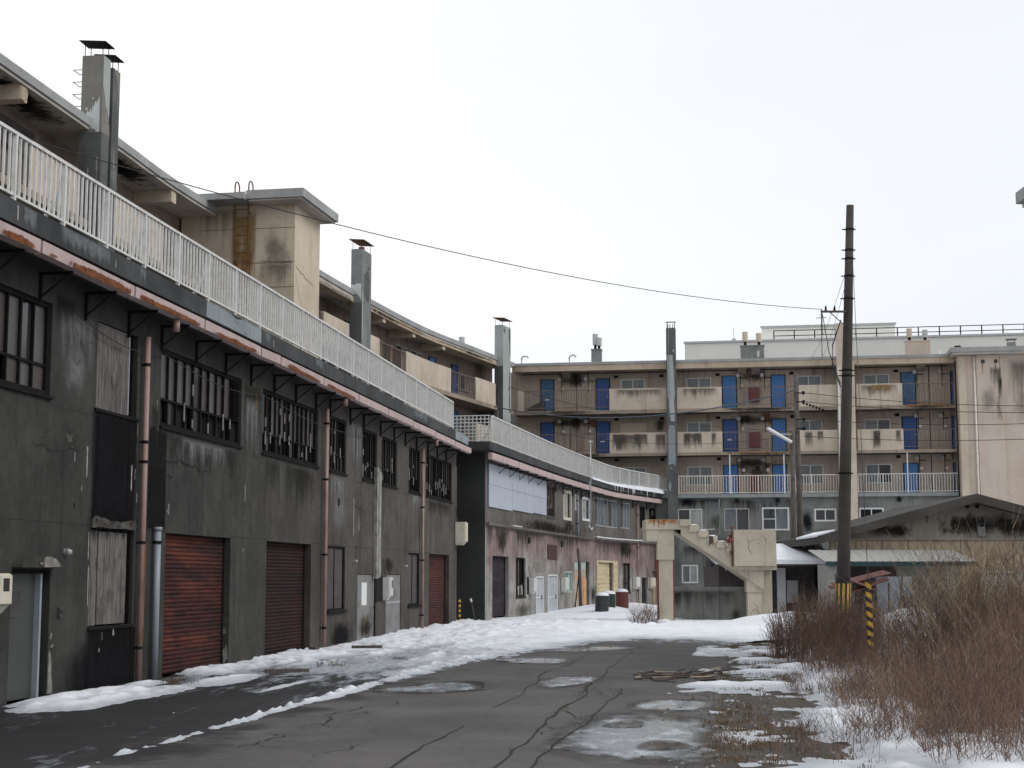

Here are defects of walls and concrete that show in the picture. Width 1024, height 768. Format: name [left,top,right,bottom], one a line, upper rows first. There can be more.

corrosion [3,229,35,248]
corrosion [233,216,255,275]
corrosion [70,261,201,326]
leakage [685,434,716,443]
leakage [489,522,553,553]
leakage [952,516,1024,533]